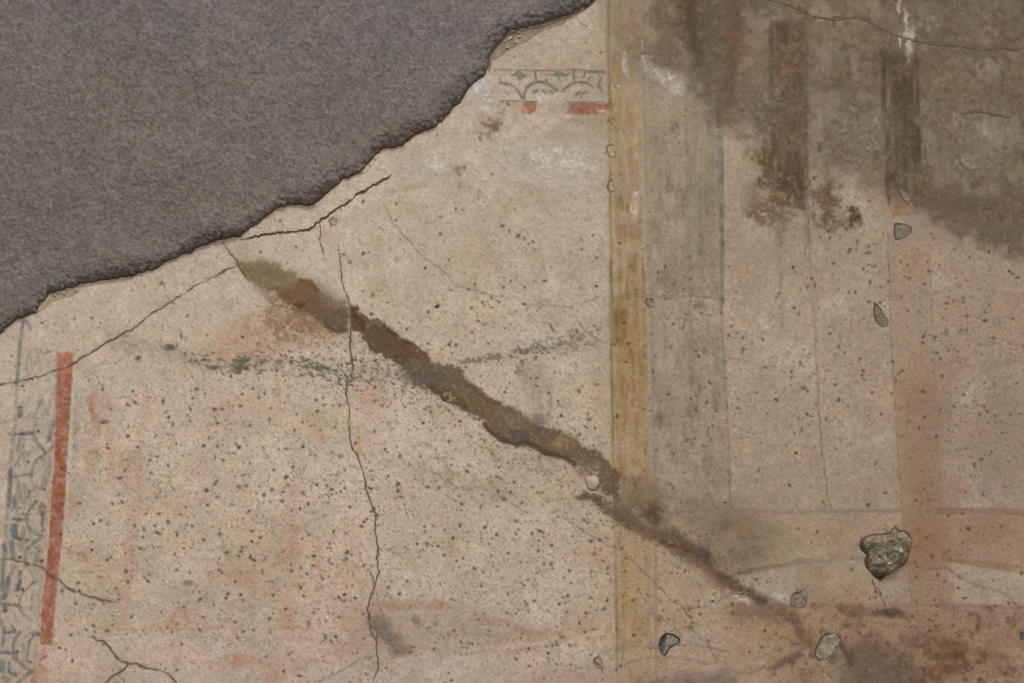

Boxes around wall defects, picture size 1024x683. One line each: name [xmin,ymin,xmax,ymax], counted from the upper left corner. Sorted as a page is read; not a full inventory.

flaking render [488,0,596,72]
water stain [641,0,1024,256]
crack [770,0,1024,51]
flaking render [37,289,80,312]
crack [0,175,735,683]
water stain [236,259,802,635]